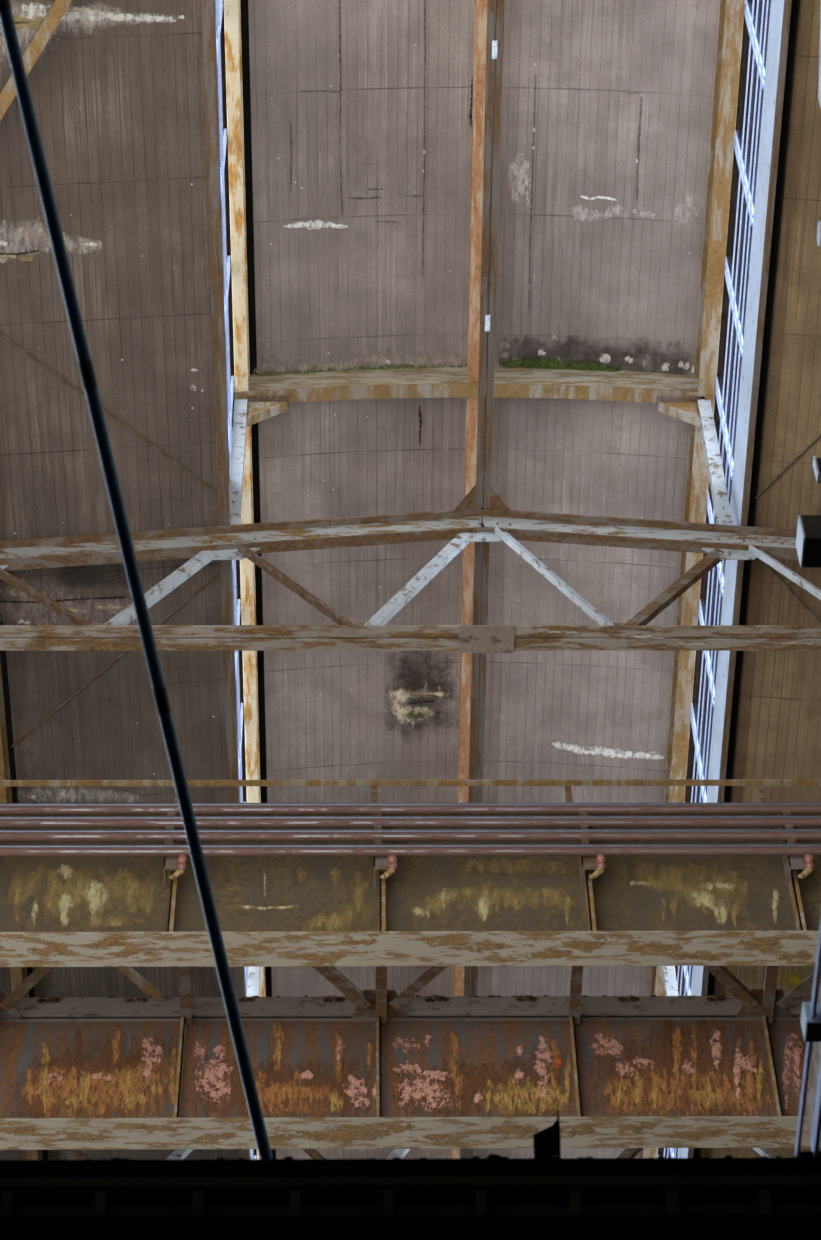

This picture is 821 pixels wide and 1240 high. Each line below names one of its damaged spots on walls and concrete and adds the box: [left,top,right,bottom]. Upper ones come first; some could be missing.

leakage [0,1,51,61]
leakage [41,3,184,55]
leakage [0,220,102,263]
leakage [284,220,348,231]
leakage [548,741,664,760]
peeling [27,936,162,959]
peeling [525,934,607,960]
peeling [625,941,722,961]
rust [11,1021,376,1118]
rust [392,1031,573,1117]
rust [590,1019,811,1116]
peeling [268,1120,538,1145]